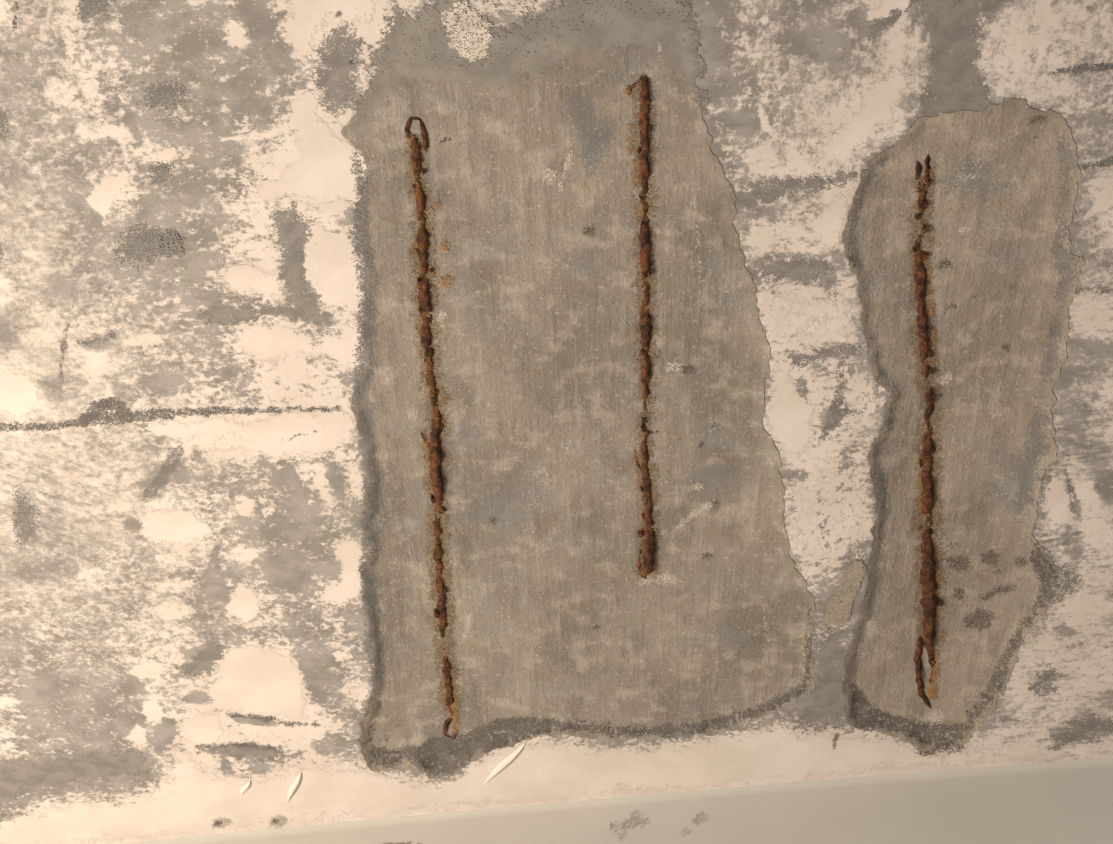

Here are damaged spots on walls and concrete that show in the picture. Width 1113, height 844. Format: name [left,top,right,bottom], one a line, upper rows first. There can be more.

peeling [312,21,366,115]
peeling [85,170,134,219]
peeling [221,201,319,314]
peeling [195,301,333,330]
peeling [236,319,363,368]
corrosion [623,74,662,581]
crack [0,397,342,503]
corrosion [404,133,464,734]
corrosion [901,162,949,701]
peeling [223,579,262,626]
peeling [175,644,311,722]
peeling [178,710,305,765]